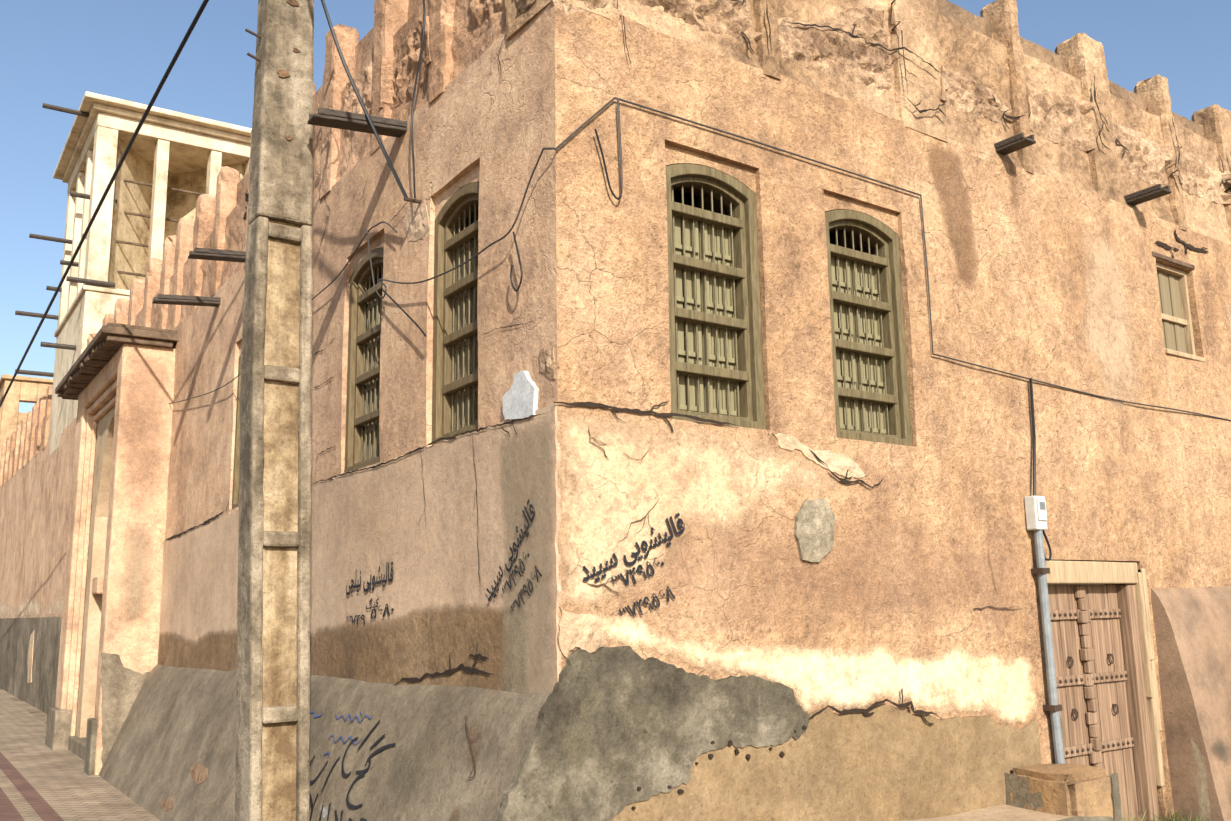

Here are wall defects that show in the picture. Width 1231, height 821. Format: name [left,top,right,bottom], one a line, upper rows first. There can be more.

flaking render [469,0,609,41]
flaking render [630,0,893,91]
flaking render [772,433,867,479]
crack [314,400,739,579]
crack [585,581,623,596]
damp [158,632,238,671]
damp [310,607,526,693]
crack [394,647,494,686]
flaking render [557,607,1041,821]
crack [809,688,943,725]